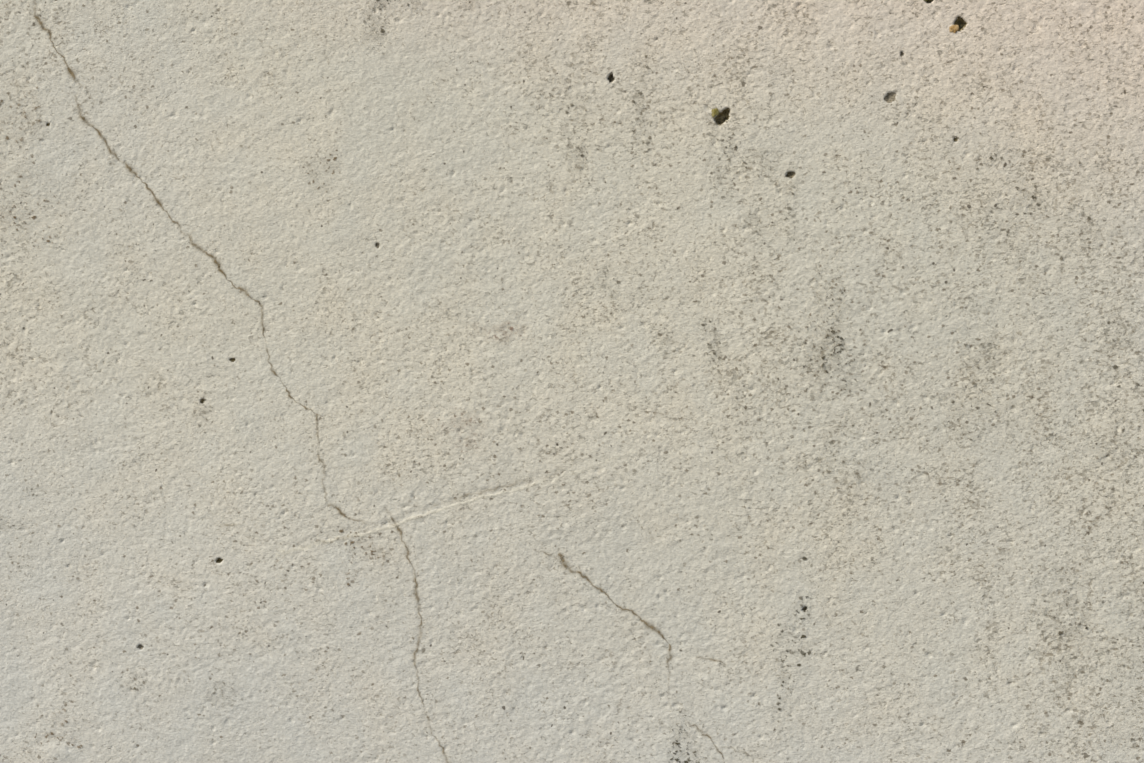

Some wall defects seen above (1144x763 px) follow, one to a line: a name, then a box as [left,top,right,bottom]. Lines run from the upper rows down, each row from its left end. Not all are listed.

crack [35,16,75,79]
crack [80,114,319,442]
crack [391,518,422,659]
crack [546,553,671,660]